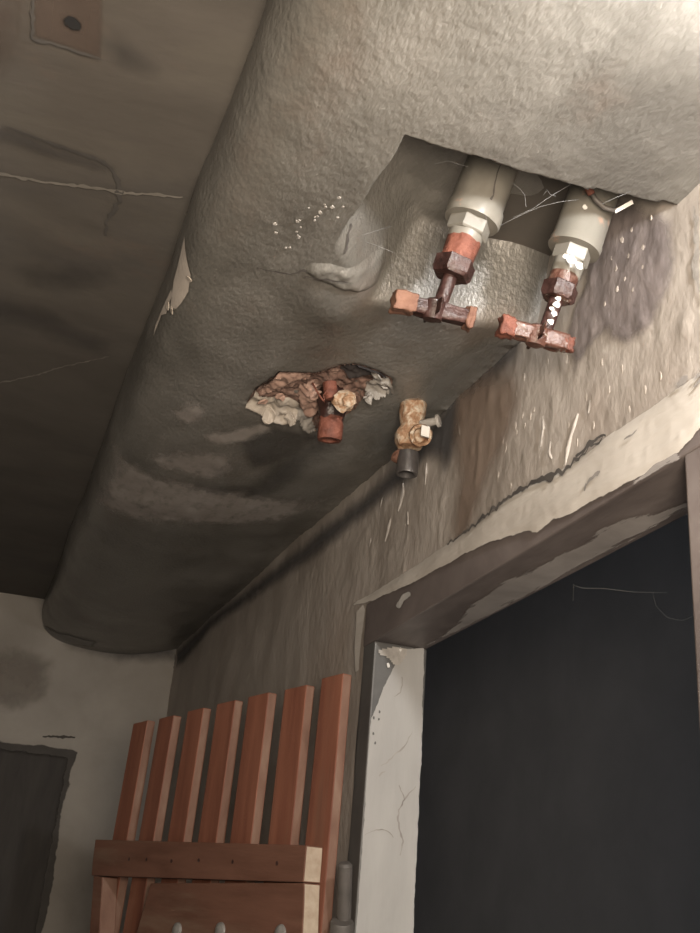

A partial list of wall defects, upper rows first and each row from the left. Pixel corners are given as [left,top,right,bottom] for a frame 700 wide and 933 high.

crack [0,172,186,215]
peeling [153,237,192,336]
spalling [245,363,395,434]
crack [447,434,606,545]